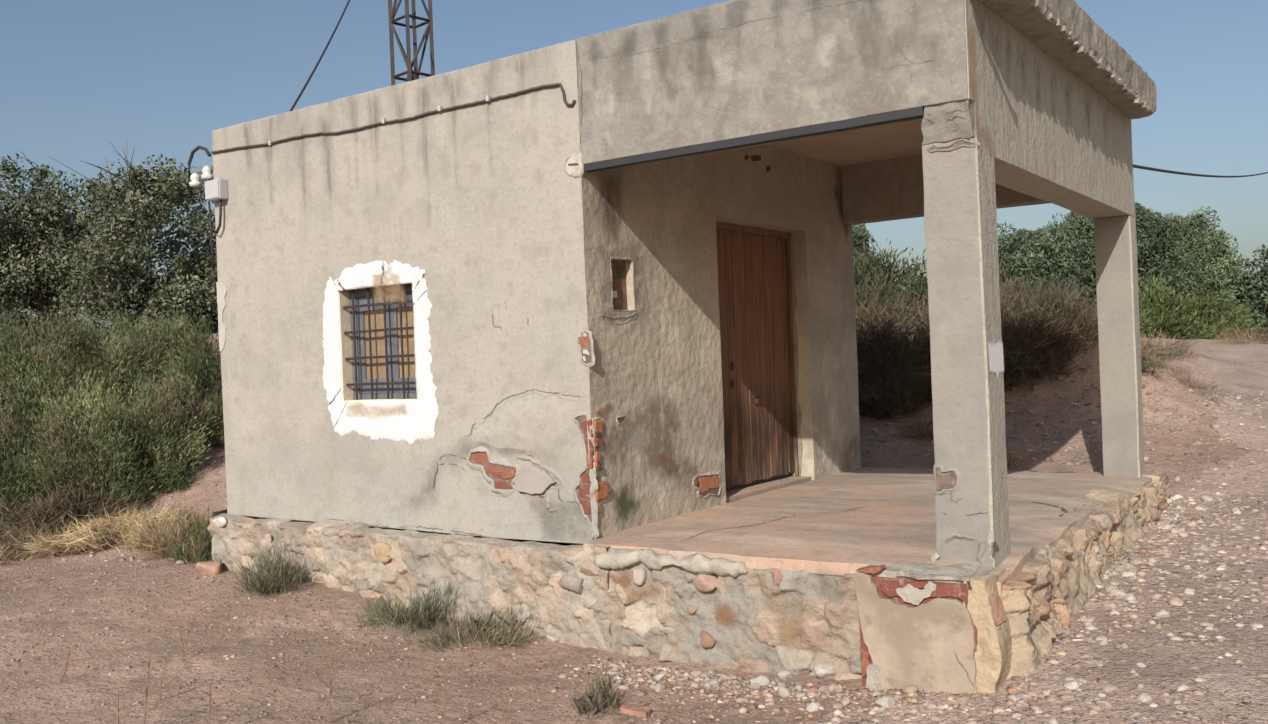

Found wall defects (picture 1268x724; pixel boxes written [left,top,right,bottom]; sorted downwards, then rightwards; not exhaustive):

spalling [577,330,595,367]
crack [433,389,588,490]
spalling [466,445,557,498]
spalling [573,412,625,540]
spalling [692,471,721,499]
spalling [933,465,963,496]
spalling [855,564,968,608]
spalling [989,596,1006,626]
spalling [860,648,882,690]